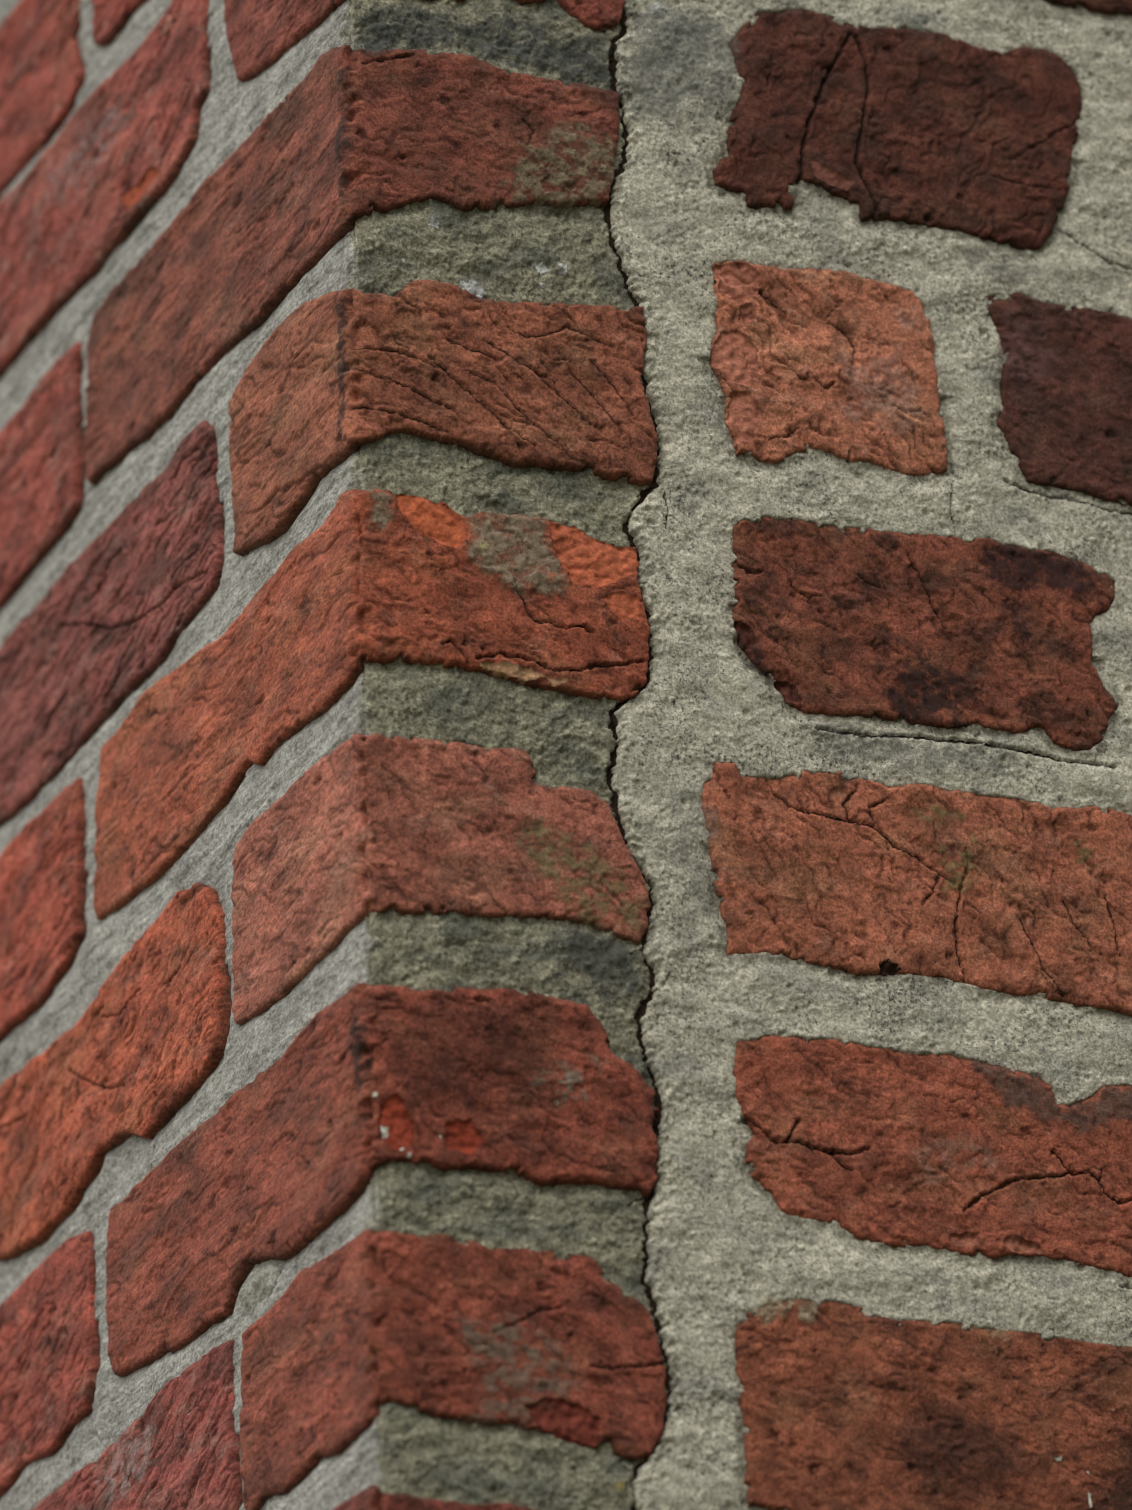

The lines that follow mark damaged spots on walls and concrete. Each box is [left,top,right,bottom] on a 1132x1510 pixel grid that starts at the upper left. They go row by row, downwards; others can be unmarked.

crack [601,10,639,306]
crack [799,37,877,212]
crack [815,728,1111,768]
crack [340,326,672,1510]
crack [742,1119,862,1171]
crack [964,1151,1130,1210]